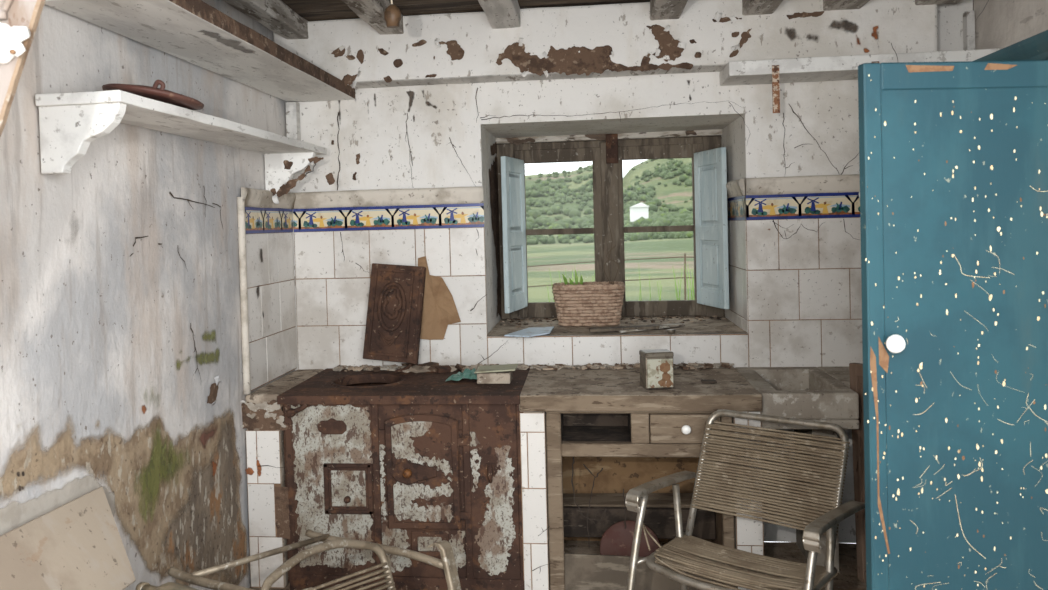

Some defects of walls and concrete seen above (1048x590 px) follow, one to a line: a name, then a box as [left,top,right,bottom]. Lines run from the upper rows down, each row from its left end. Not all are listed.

peeling [328,45,364,88]
peeling [378,48,403,83]
peeling [412,38,464,61]
peeling [496,24,701,78]
peeling [712,13,752,57]
crack [782,104,859,175]
water stain [0,411,248,586]